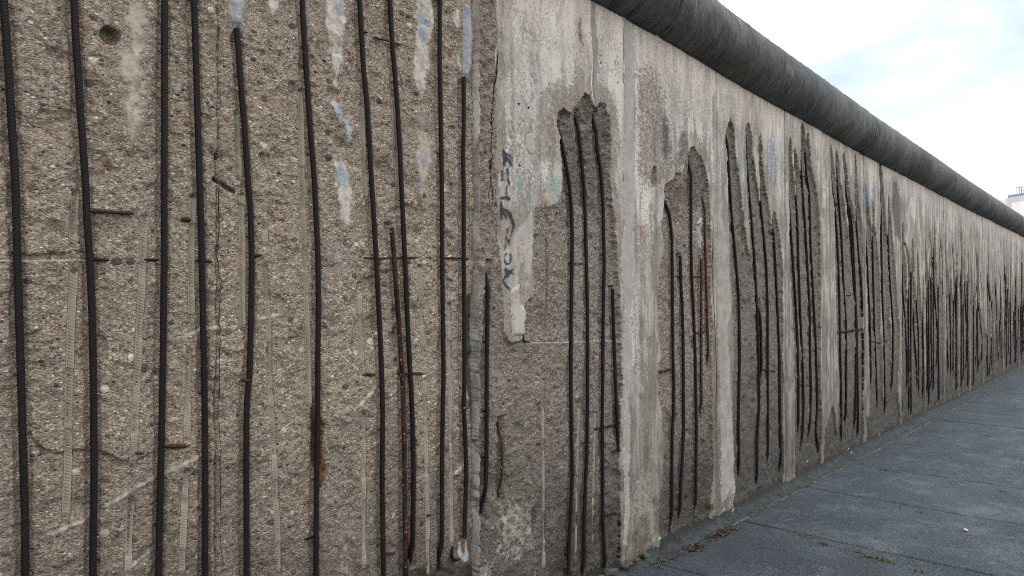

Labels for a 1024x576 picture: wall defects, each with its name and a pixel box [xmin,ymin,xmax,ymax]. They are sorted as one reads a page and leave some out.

crack [216,176,226,565]
corrosion [308,398,327,486]
spalling [473,0,623,576]
spalling [650,146,714,538]
spalling [725,119,1024,503]